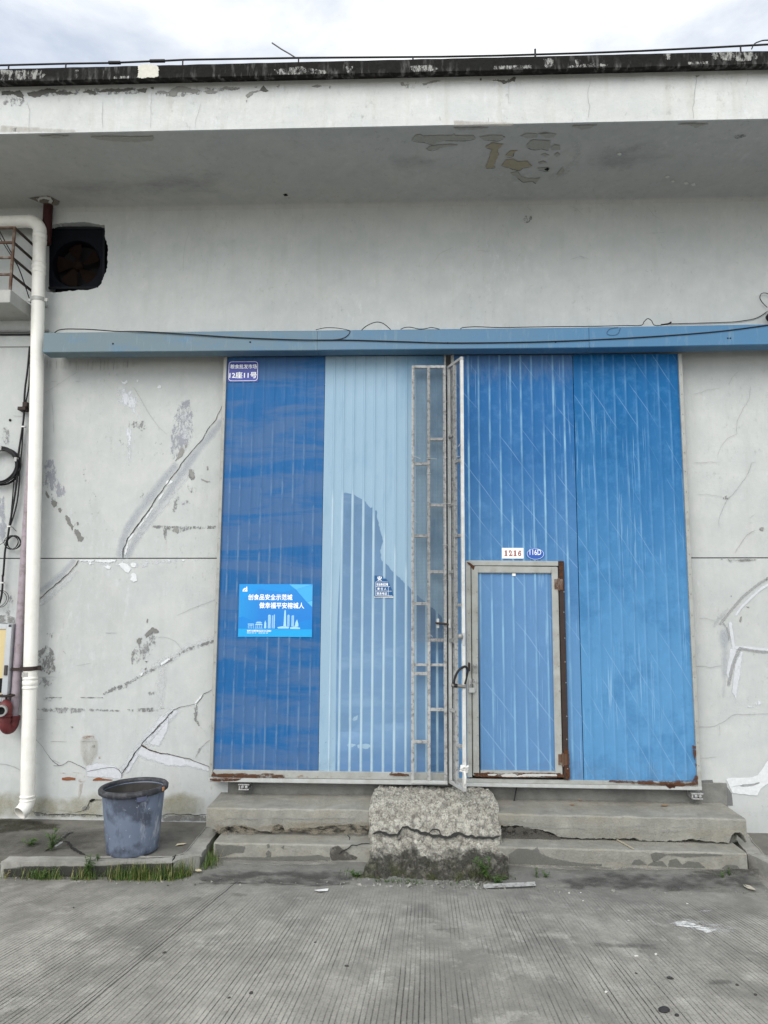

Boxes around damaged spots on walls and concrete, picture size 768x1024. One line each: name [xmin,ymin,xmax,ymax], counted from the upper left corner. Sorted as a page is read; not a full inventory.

peeling [1,85,280,106]
peeling [412,127,564,184]
crack [122,409,221,555]
peeling [45,491,84,542]
crack [39,561,78,605]
flaking render [131,619,159,670]
crack [698,577,768,729]
crack [34,637,214,859]
rust [210,772,284,782]
rust [609,745,698,788]
crack [330,826,500,861]
spalling [501,823,565,840]